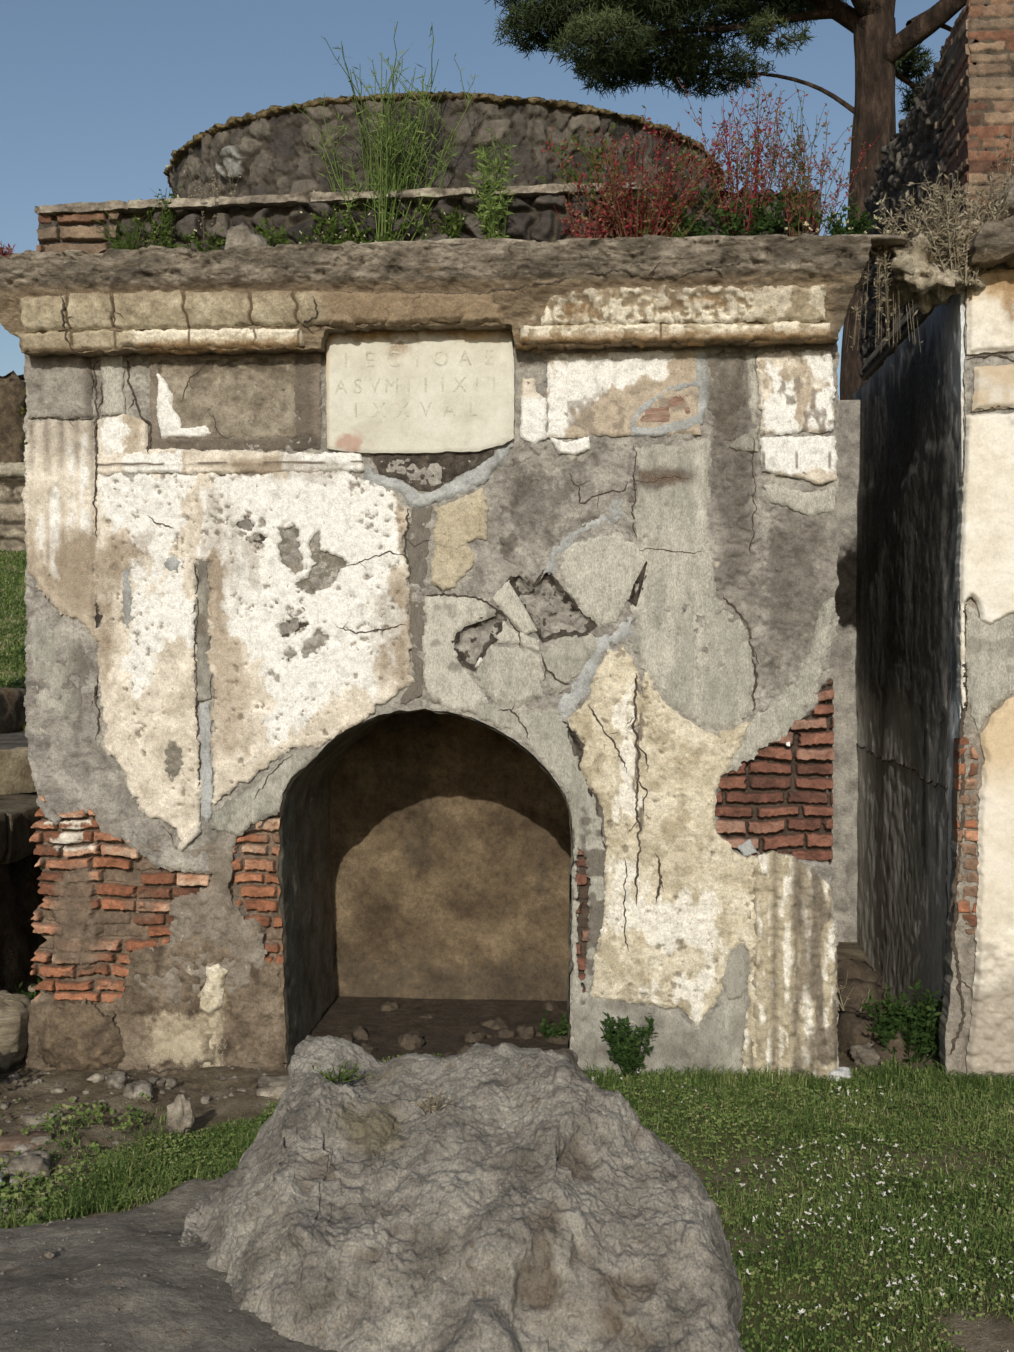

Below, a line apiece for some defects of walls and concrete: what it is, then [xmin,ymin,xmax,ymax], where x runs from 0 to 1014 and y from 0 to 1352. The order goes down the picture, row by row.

spalling [236,516,347,594]
spalling [451,610,507,671]
spalling [507,569,597,643]
crack [570,445,705,554]
crack [716,589,758,713]
crack [749,437,757,553]
water stain [855,334,959,711]
spalling [29,795,212,1003]
spalling [230,812,284,964]
crack [338,508,664,951]
spalling [715,678,834,865]
crack [856,604,972,1055]